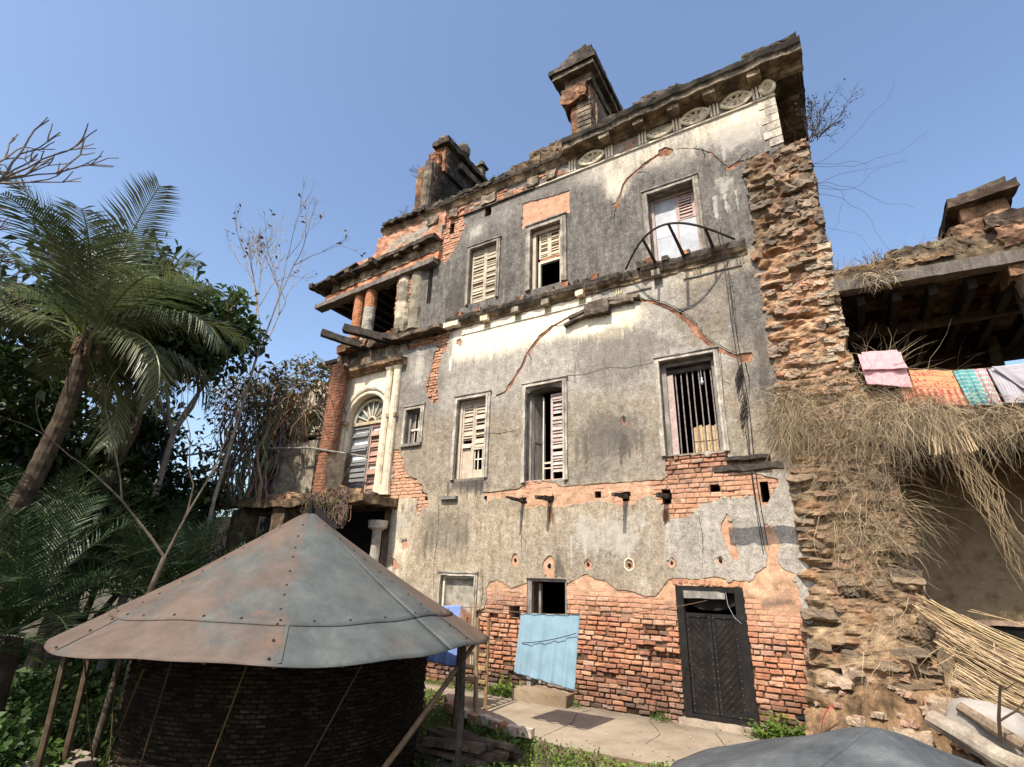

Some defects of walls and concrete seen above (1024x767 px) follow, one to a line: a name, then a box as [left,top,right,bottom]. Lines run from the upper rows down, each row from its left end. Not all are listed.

peeling [441,202,480,264]
peeling [495,186,570,229]
crack [613,148,746,225]
peeling [396,331,463,405]
crack [493,318,568,398]
crack [635,297,753,396]
peeling [386,449,429,516]
peeling [481,451,780,518]
peeling [425,580,527,691]
peeling [566,514,809,734]